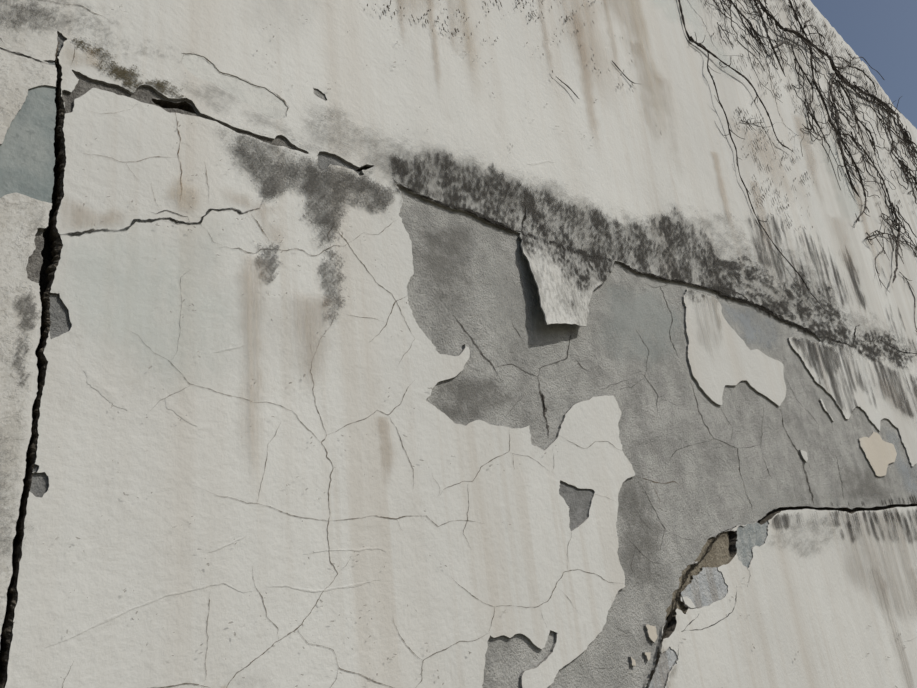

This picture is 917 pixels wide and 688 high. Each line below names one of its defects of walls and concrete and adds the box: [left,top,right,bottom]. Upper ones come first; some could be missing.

peeling [0,70,374,203]
leakage [13,294,40,385]
flaking render [26,228,45,283]
crack [0,39,419,688]
crack [394,180,527,232]
leakage [238,137,917,416]
crack [615,261,917,359]
crack [393,315,917,688]
flaking render [396,184,917,688]
leakage [834,482,917,542]